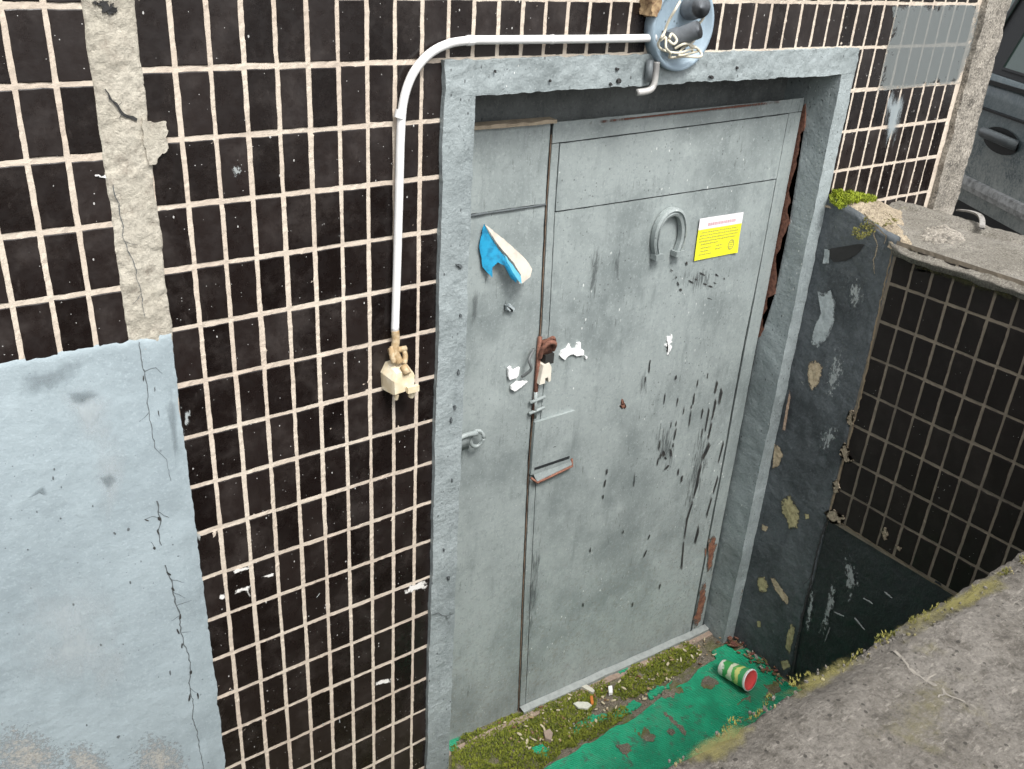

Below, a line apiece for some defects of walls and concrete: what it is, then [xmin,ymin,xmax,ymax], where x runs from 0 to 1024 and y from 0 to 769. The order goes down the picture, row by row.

crack [105,89,137,121]
crack [113,186,145,316]
rust [539,135,552,336]
rust [758,104,806,337]
peeling [807,290,836,390]
crack [139,342,171,480]
crack [147,501,204,769]
rust [518,418,533,712]
rust [693,536,717,628]
spalling [757,577,789,604]
spalling [780,624,795,670]
spalling [781,494,809,529]